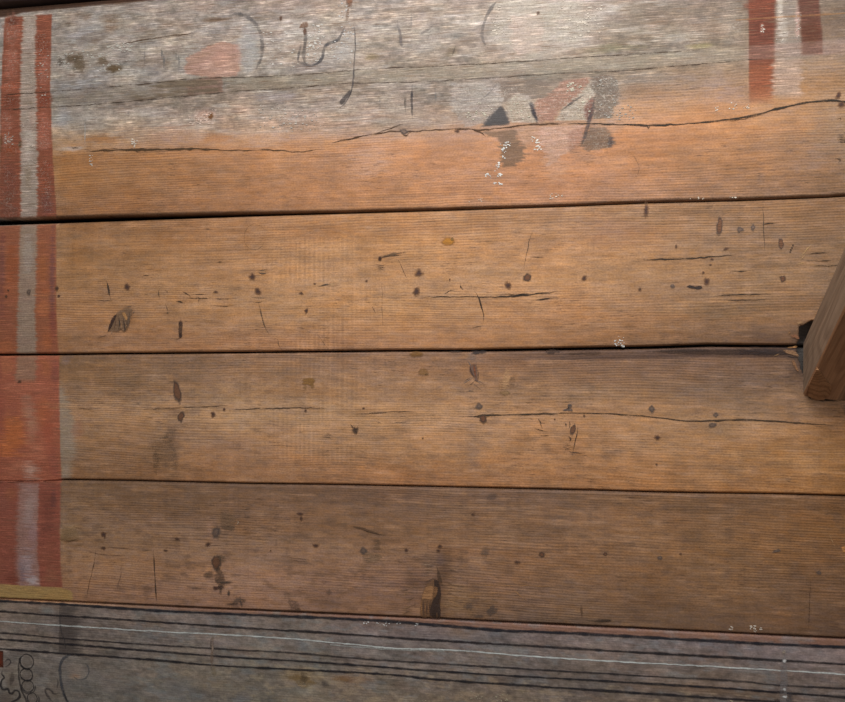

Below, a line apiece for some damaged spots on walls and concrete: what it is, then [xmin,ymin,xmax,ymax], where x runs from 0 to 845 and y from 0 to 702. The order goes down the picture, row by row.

crack [73,99,845,152]